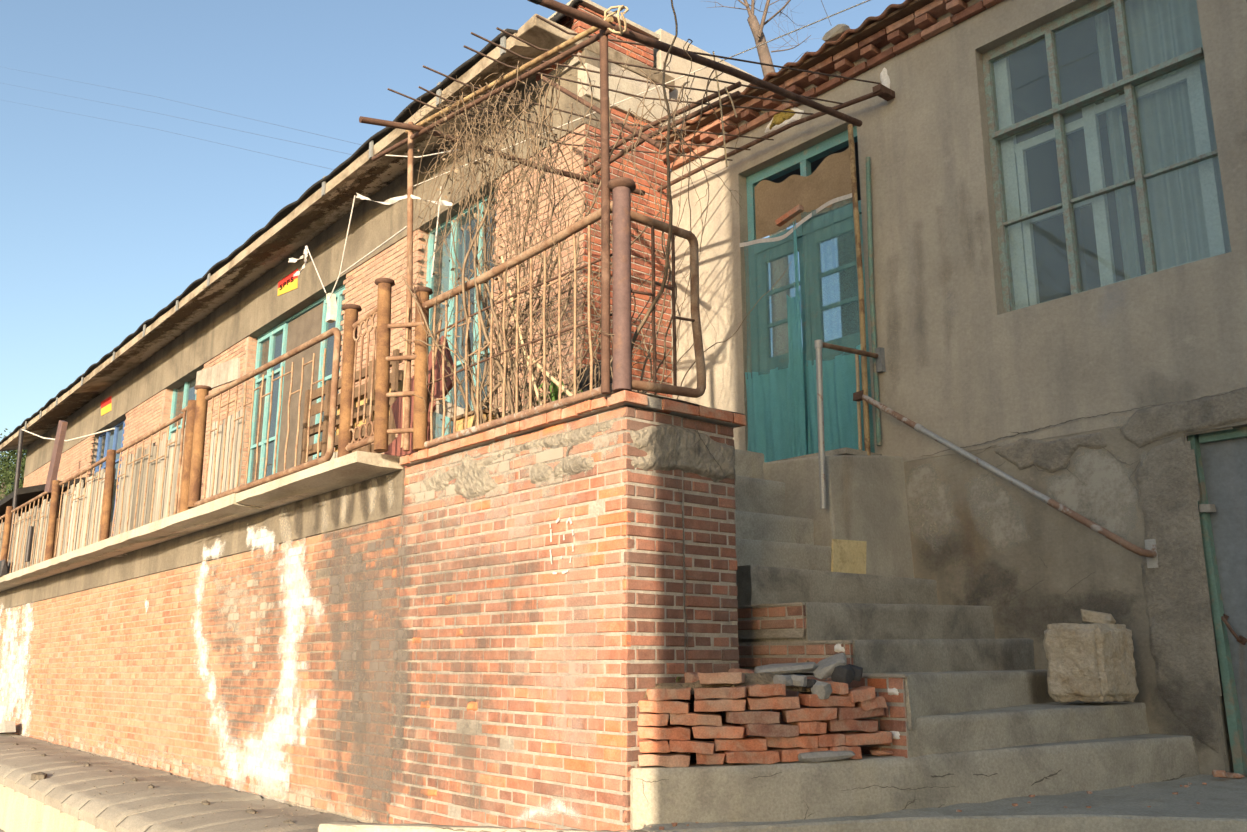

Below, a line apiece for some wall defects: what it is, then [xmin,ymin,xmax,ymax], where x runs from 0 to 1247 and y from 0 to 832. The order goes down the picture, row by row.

leakage [0,603,34,736]
leakage [44,418,736,822]
crack [842,773,997,810]
peeling [994,387,1247,756]